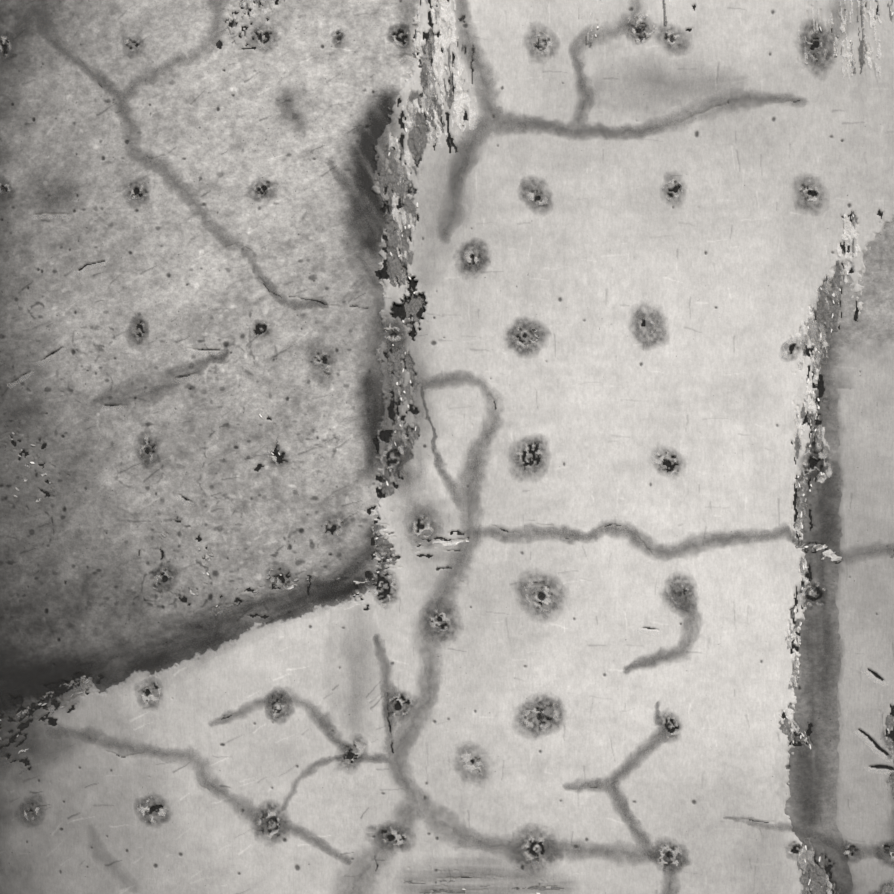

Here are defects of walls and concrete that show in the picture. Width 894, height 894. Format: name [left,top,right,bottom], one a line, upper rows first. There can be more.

crack [42,21,211,222]
damp [347,92,395,254]
crack [442,1,800,236]
crack [222,241,327,307]
peeling [0,0,475,770]
damp [0,525,396,715]
crack [52,374,802,894]
peeling [779,209,894,894]
flaking render [404,876,473,894]